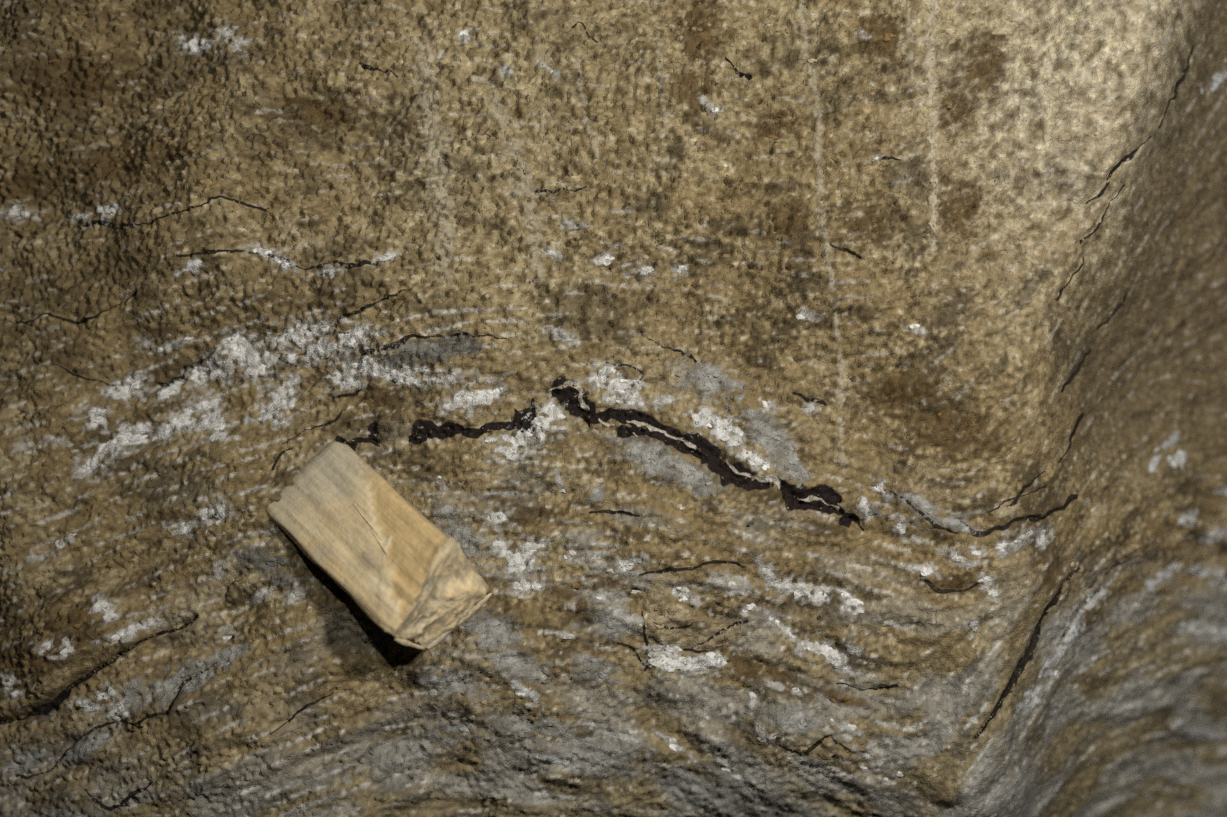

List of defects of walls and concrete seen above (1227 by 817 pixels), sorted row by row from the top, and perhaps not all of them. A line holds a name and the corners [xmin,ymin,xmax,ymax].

crack [725,56,752,80]
crack [79,195,268,230]
crack [176,249,392,270]
crack [829,243,862,259]
crack [253,289,508,356]
efflorescence [13,314,508,483]
efflorescence [482,394,579,464]
crack [271,362,865,531]
crack [871,292,1128,537]
crack [639,560,747,575]
crack [0,616,197,725]
crack [973,540,1157,739]